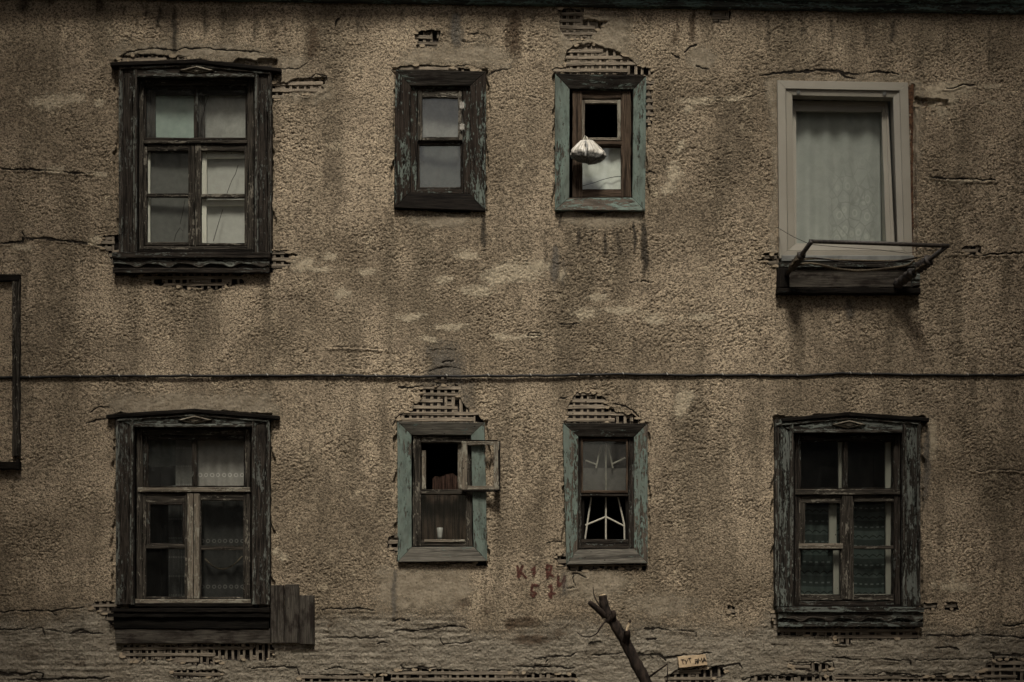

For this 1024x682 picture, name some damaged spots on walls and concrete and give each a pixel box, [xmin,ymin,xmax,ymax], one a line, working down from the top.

flaking render [413,30,440,48]
peeling [272,56,331,104]
peeling [552,6,655,127]
crack [720,69,899,99]
crack [1,167,91,175]
crack [929,174,996,182]
crack [0,231,104,247]
water stain [632,222,649,274]
crack [955,250,1024,258]
flaking render [395,346,483,423]
flaking render [563,391,645,423]
peeling [0,560,1024,682]